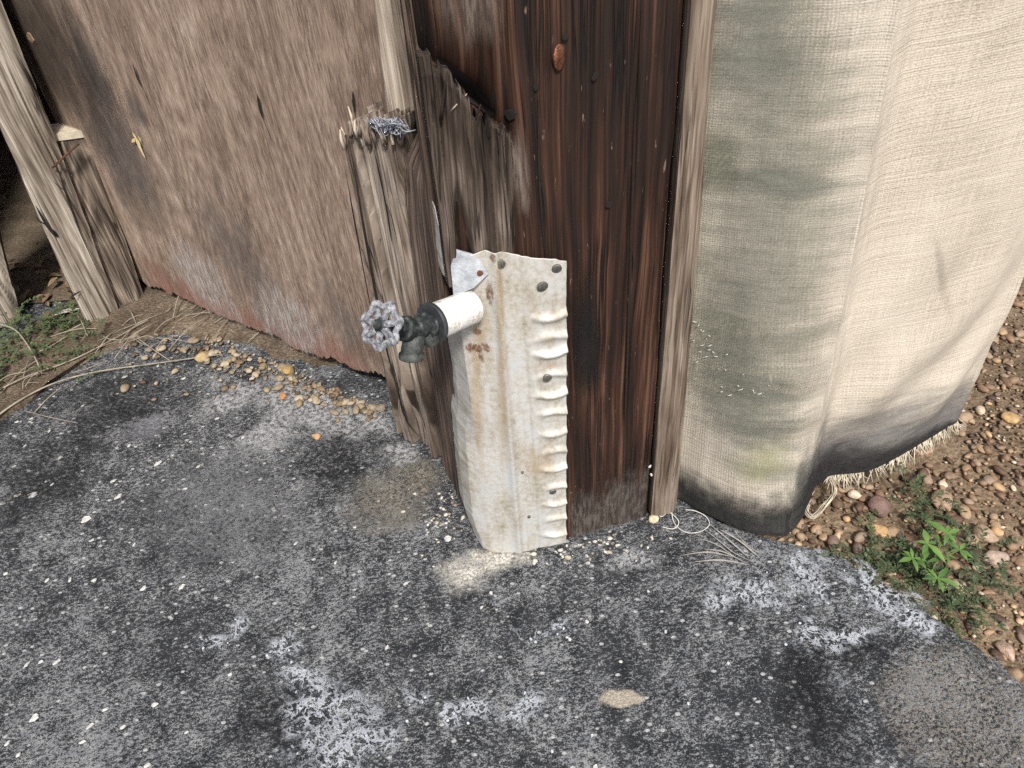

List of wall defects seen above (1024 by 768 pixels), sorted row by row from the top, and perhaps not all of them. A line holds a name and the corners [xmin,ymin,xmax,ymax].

rust [466,328,489,360]
leakage [832,639,885,662]
leakage [253,684,318,736]
leakage [789,661,846,752]